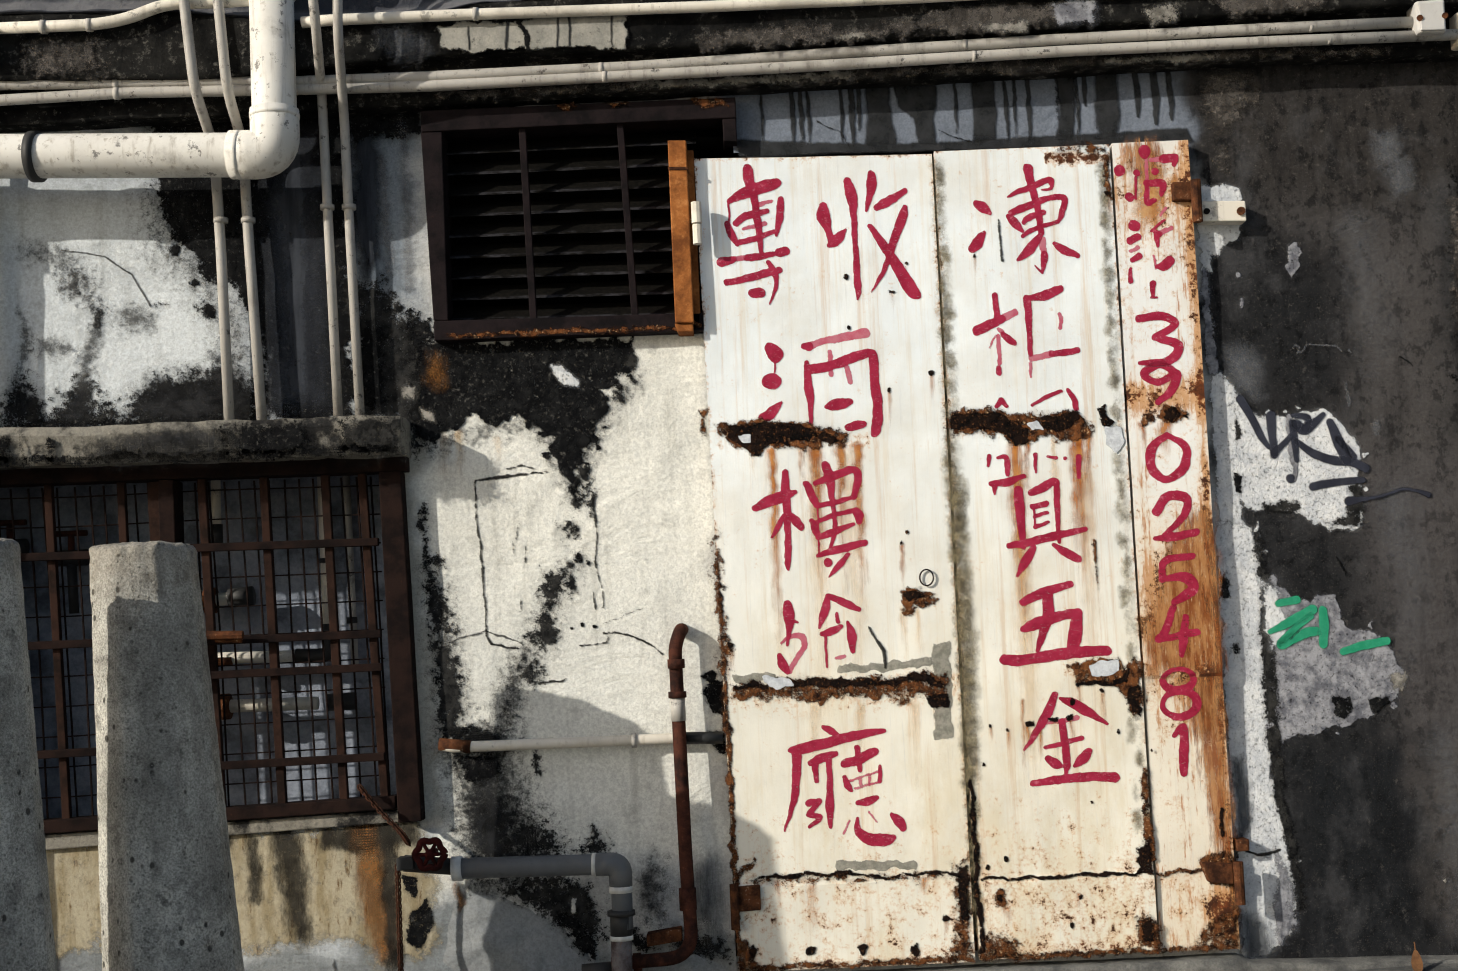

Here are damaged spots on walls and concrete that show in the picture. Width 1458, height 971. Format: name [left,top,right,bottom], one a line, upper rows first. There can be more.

leakage [21,31,110,87]
leakage [695,0,1096,53]
leakage [435,45,1392,157]
rust [1049,139,1176,226]
leakage [1143,3,1178,27]
peeling [1201,68,1260,201]
leakage [0,112,437,469]
rust [928,281,954,385]
peeling [1196,225,1409,959]
leakage [416,482,615,858]
rust [707,403,1242,971]
leakage [466,876,610,961]